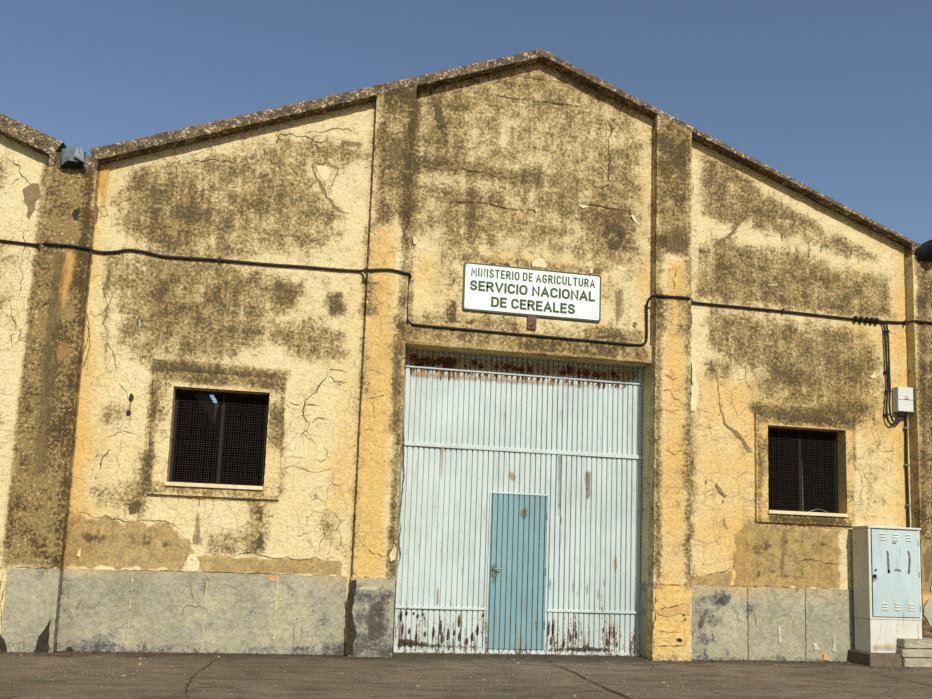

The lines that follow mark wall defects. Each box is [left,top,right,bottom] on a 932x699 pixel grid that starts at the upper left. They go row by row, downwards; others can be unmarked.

crack [194,128,355,213]
leakage [434,103,449,155]
crack [393,131,529,181]
crack [451,74,640,226]
leakage [602,219,627,250]
crack [290,369,346,436]
corrosion [408,350,638,388]
crack [662,312,777,471]
flaking render [186,554,200,571]
spalling [923,619,932,639]